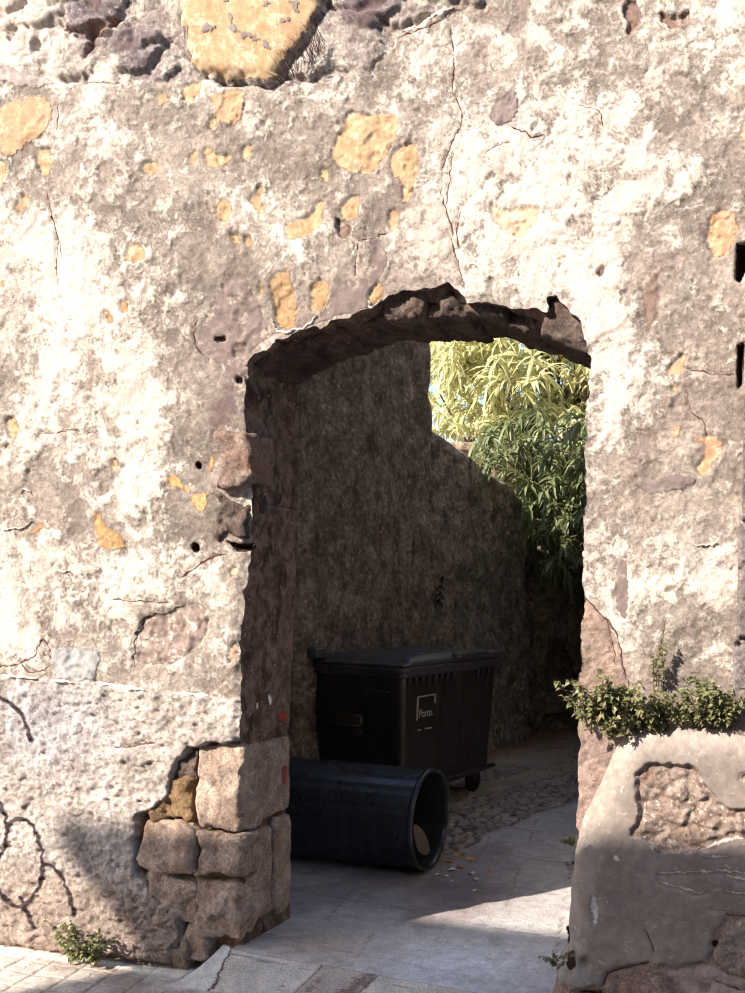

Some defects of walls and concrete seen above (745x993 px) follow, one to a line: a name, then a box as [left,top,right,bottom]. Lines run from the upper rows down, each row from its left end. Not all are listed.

flaking render [0,96,52,184]
flaking render [320,112,419,231]
crack [399,7,467,289]
crack [47,192,62,284]
flaking render [706,209,739,259]
spalling [195,240,387,389]
flaking render [694,434,722,475]
flaking render [93,510,125,550]
crack [181,554,226,578]
crack [0,639,52,673]
crack [112,598,184,667]
crack [585,597,630,686]